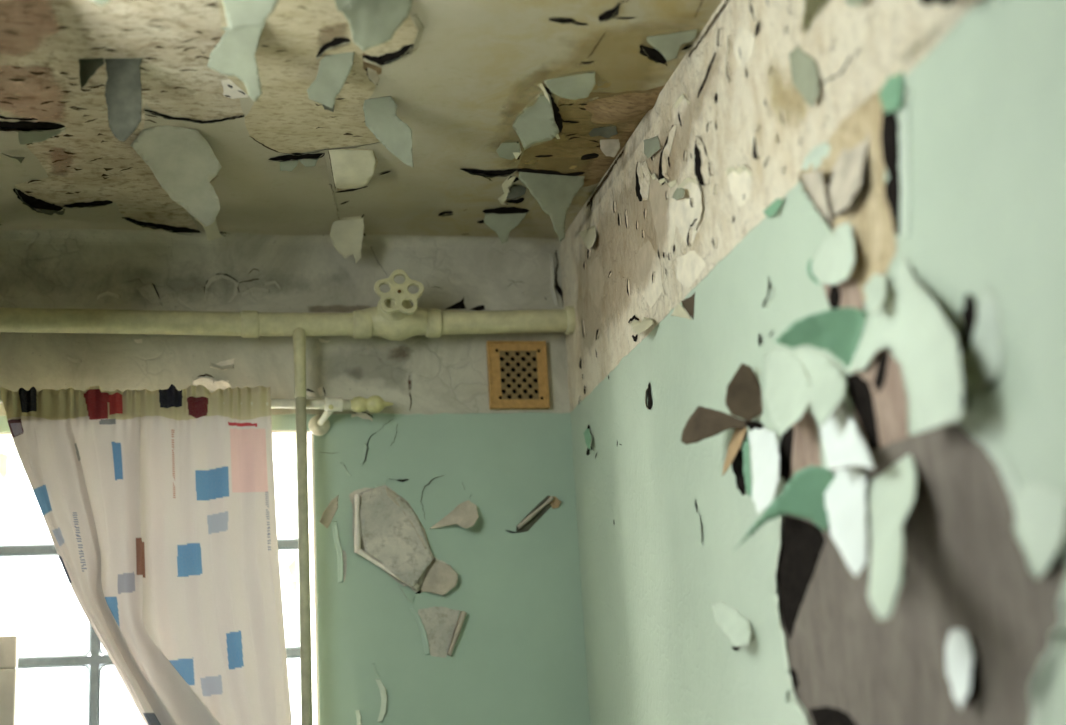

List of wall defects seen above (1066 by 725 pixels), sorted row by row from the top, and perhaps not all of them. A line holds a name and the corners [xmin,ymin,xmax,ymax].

peeling [639,29,698,67]
peeling [733,27,755,68]
flaking render [0,0,424,241]
peeling [673,93,691,139]
peeling [578,225,605,307]
peeling [628,136,706,342]
flaking render [681,71,1066,725]
peeling [506,496,561,533]
peeling [319,479,479,658]
peeling [373,663,387,722]